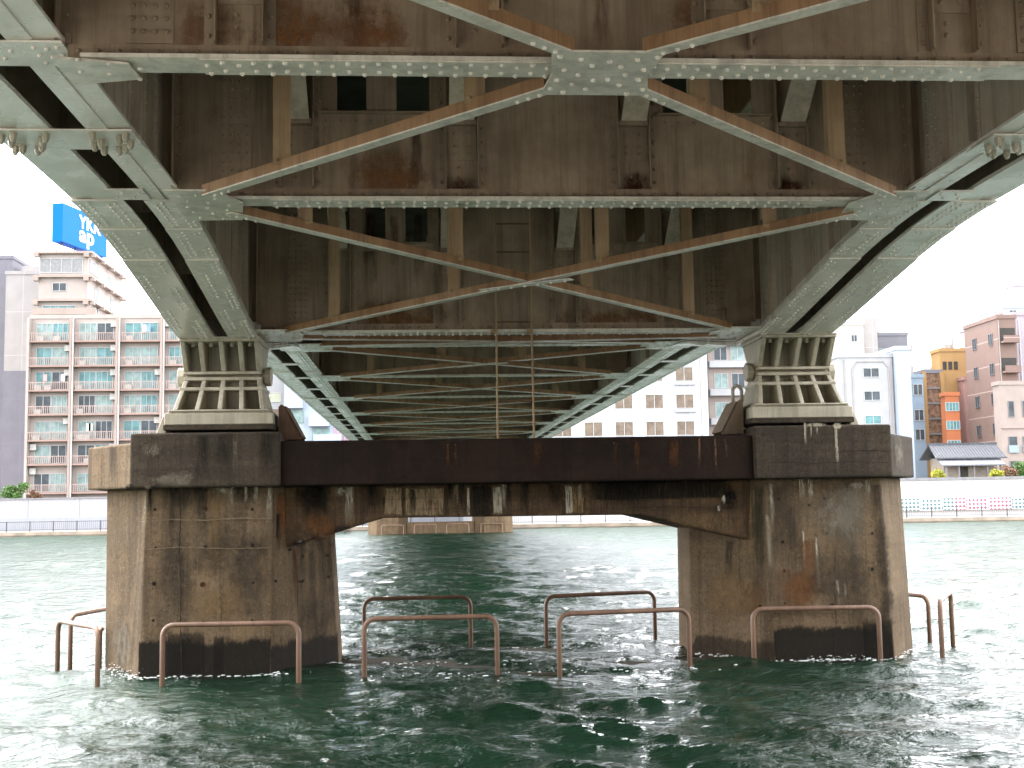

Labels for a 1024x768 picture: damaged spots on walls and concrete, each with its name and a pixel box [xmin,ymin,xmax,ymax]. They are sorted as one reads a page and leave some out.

corrosion [276,0,404,47]
corrosion [623,174,647,189]
efflorescence [804,423,841,456]
water stain [139,475,272,524]
water stain [298,486,353,514]
water stain [447,484,528,517]
water stain [550,484,584,513]
water stain [596,480,729,502]
water stain [754,486,818,565]
water stain [774,481,895,663]
water stain [138,633,339,680]